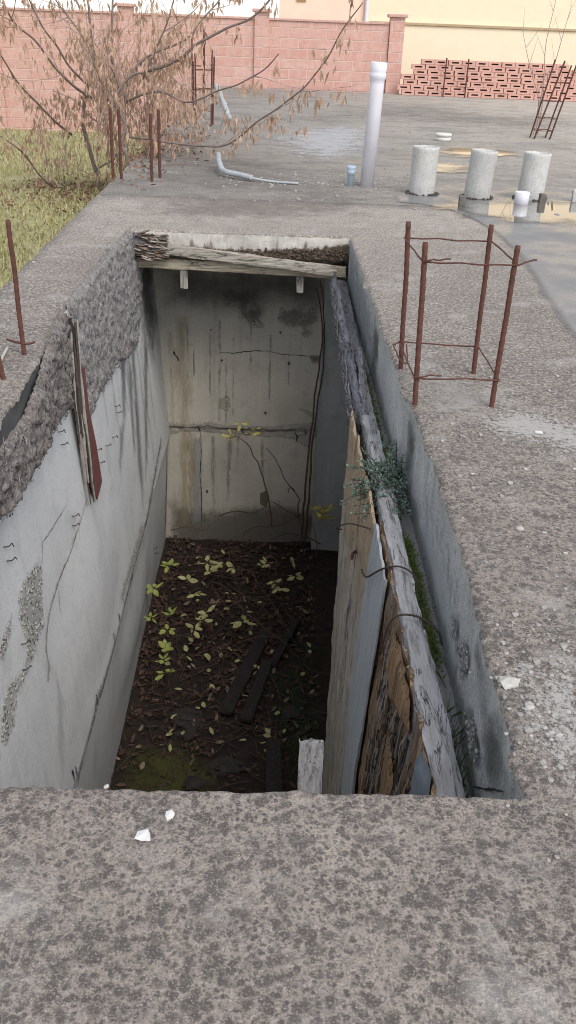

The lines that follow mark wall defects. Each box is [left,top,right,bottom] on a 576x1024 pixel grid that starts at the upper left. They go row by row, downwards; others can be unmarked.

peeling [0,220,144,523]
crack [145,422,317,526]
damp [176,508,312,542]
spalling [0,564,44,745]
crack [72,557,137,782]